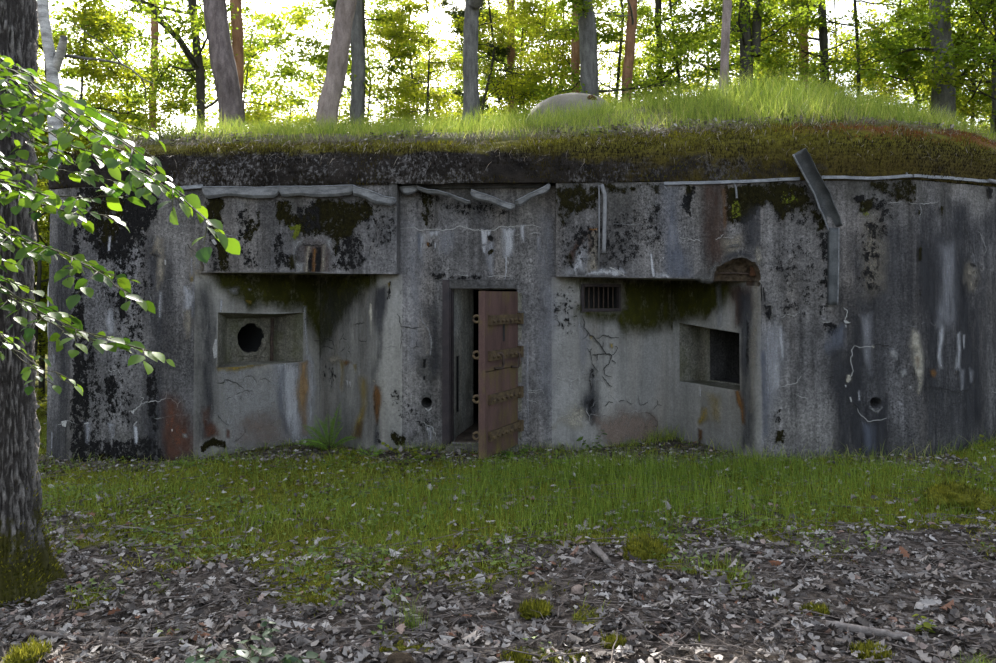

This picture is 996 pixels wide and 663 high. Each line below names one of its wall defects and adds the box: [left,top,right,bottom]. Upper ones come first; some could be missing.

rust [305,246,327,272]
leakage [590,267,624,276]
leakage [835,206,996,456]
crack [131,376,274,441]
rust [298,362,308,428]
rust [355,380,381,443]
crack [582,316,661,437]